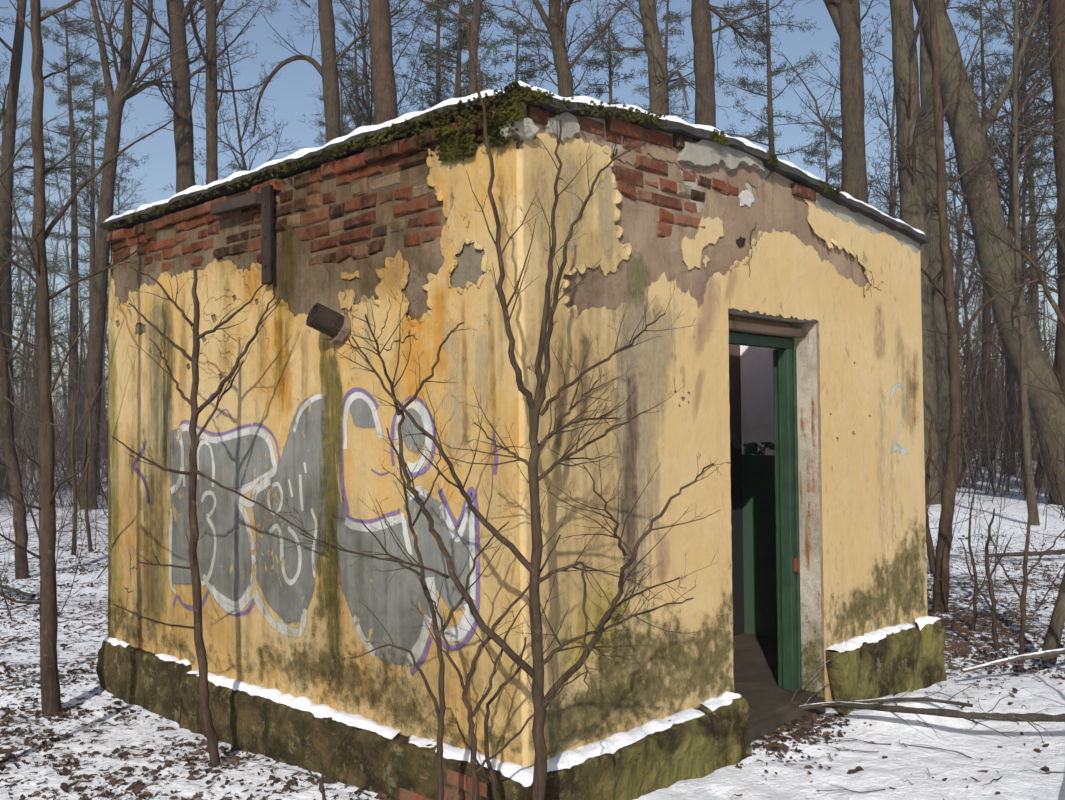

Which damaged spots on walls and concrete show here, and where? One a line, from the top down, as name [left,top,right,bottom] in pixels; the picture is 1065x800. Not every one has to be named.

flaking render [111,205,261,303]
flaking render [256,131,514,327]
flaking render [561,129,920,319]
water stain [317,344,344,673]
flaking render [399,769,487,800]